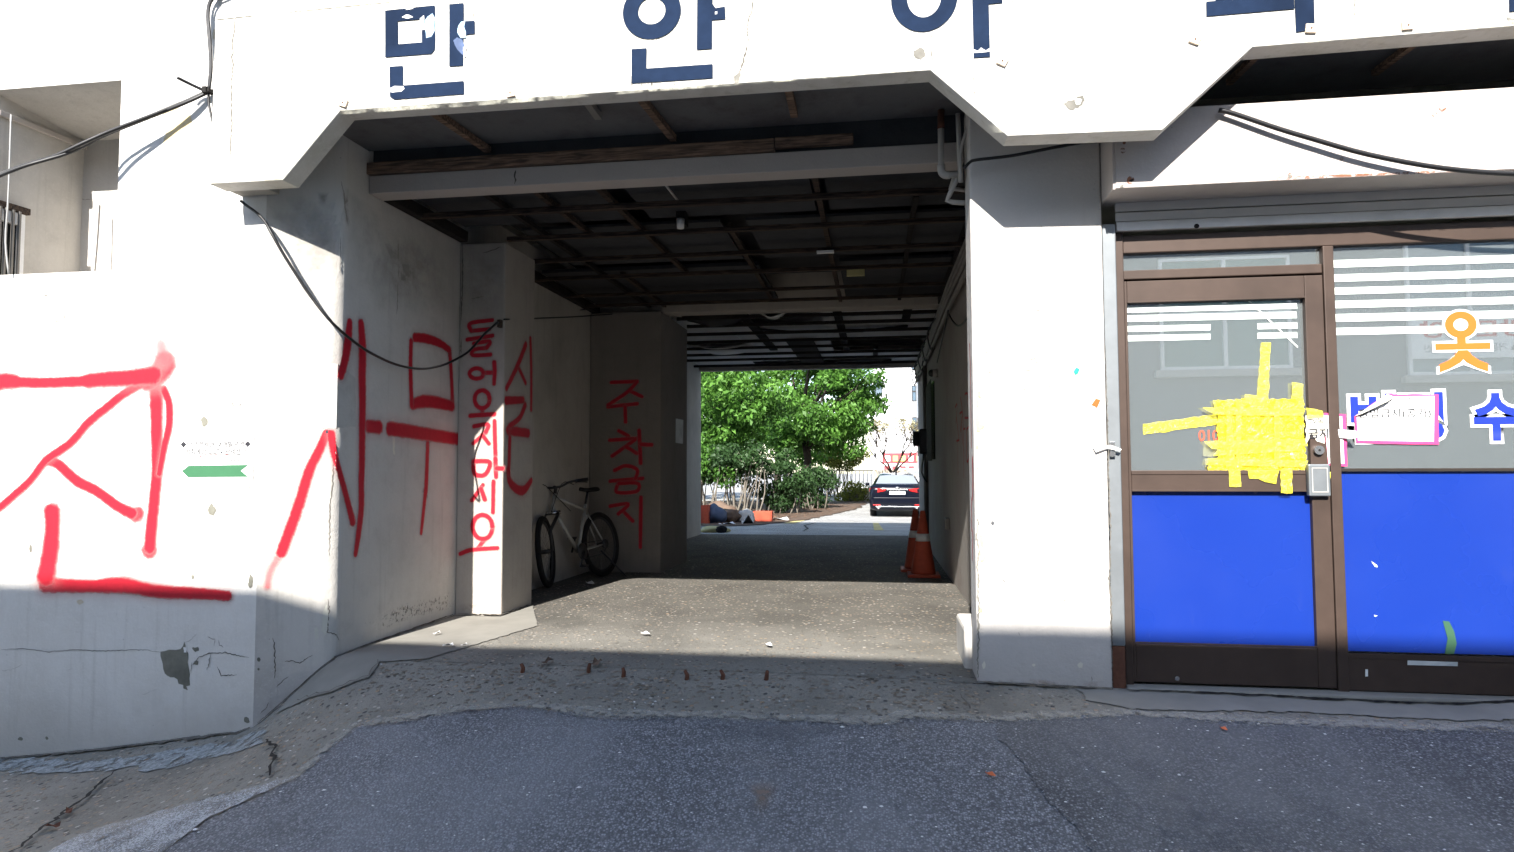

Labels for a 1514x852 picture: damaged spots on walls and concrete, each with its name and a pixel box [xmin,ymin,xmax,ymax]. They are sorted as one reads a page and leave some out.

crack [739,0,754,72]
peeling [138,97,206,275]
spalling [160,643,199,690]